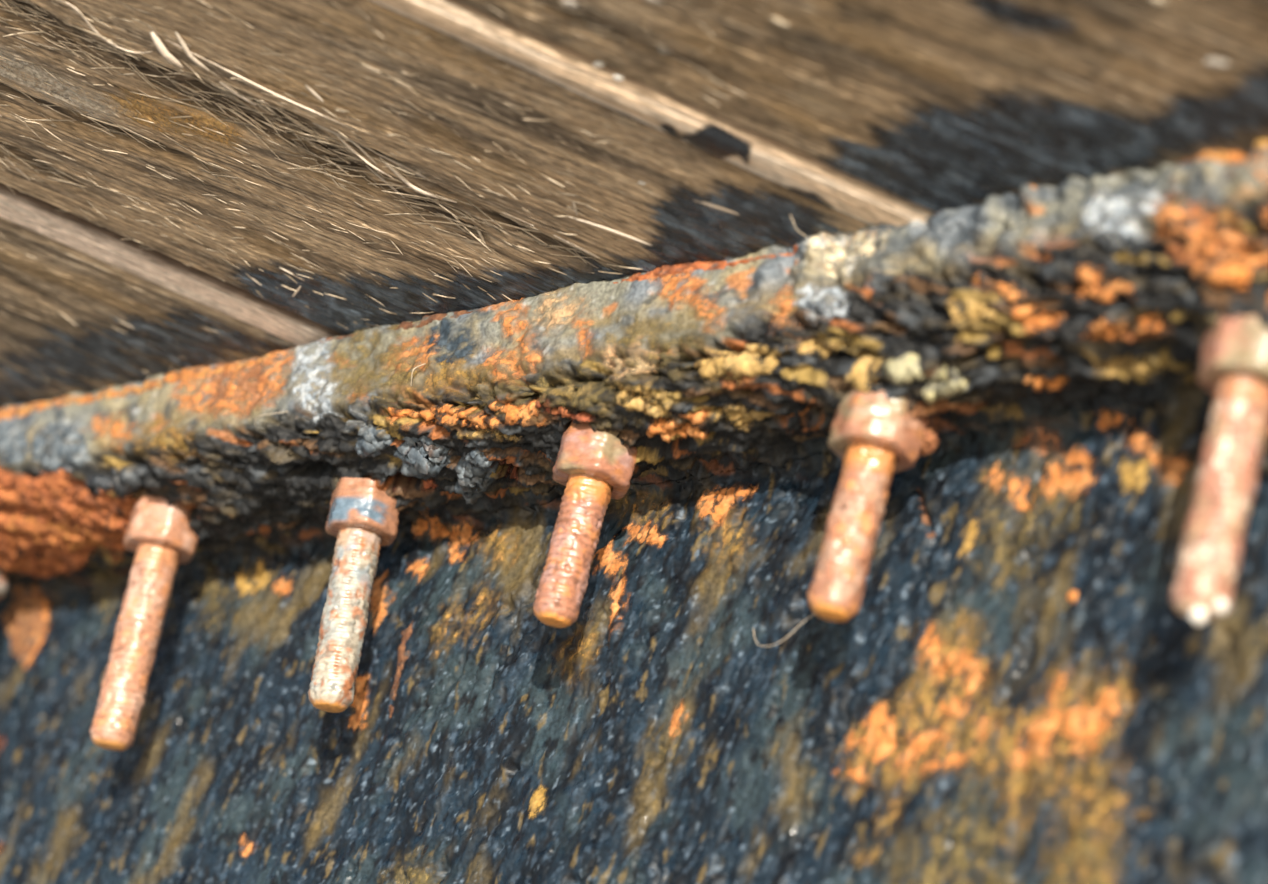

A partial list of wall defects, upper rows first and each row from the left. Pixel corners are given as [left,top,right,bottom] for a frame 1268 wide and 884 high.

rust [1171,139,1268,182]
rust [1155,205,1268,290]
rust [0,349,294,460]
rust [319,244,839,443]
rust [846,351,883,394]
rust [0,463,138,670]
rust [235,562,291,598]
rust [370,571,393,633]
rust [433,588,490,654]
rust [348,675,369,731]
rust [389,620,414,718]
rust [834,618,1134,884]